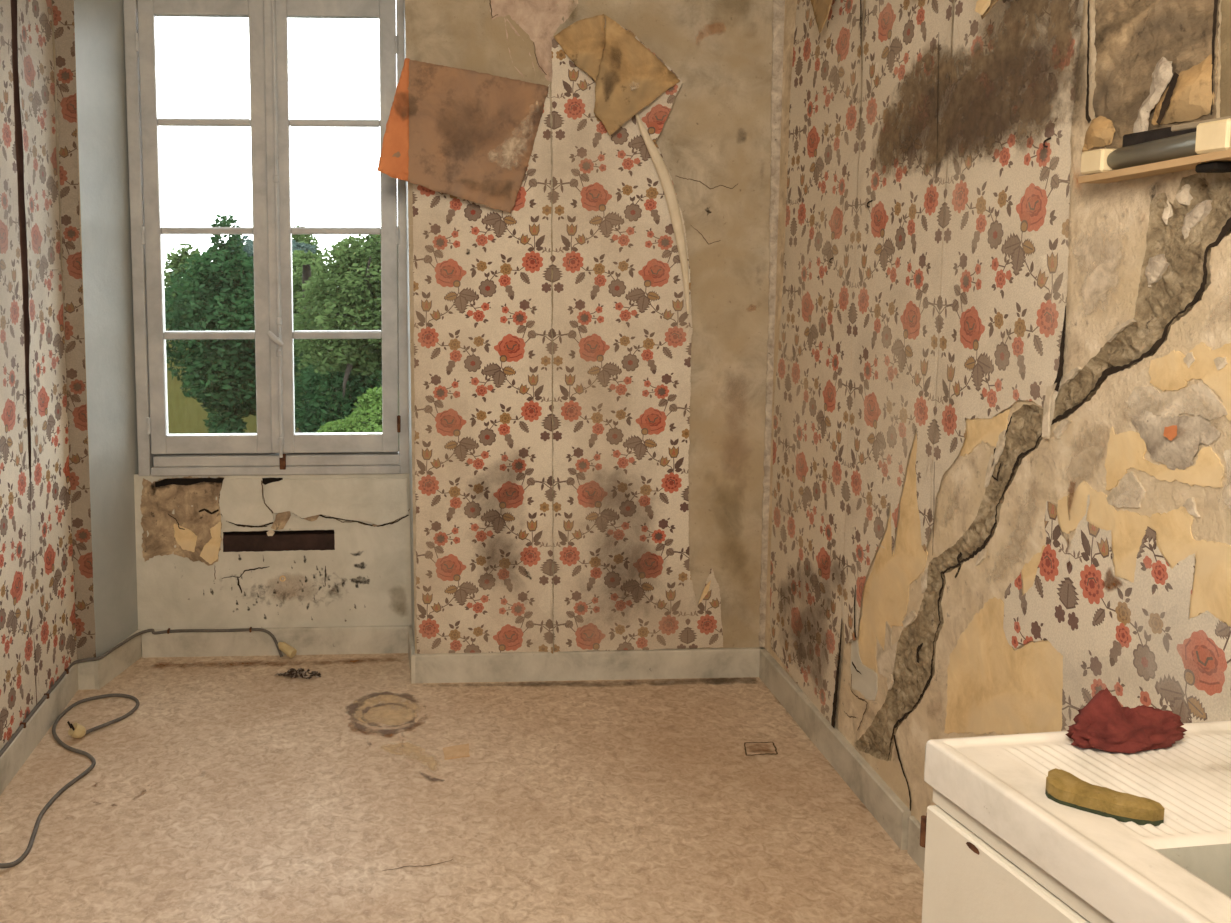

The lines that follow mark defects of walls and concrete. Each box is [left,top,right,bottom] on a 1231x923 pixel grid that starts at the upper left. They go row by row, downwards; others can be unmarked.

flaking render [489,0,578,82]
water stain [875,0,1084,172]
flaking render [1093,0,1220,148]
peeling [1042,383,1057,439]
flaking render [1126,382,1228,420]
flaking render [140,476,408,566]
crack [218,481,410,528]
crack [831,172,1231,815]
crack [214,566,270,593]
flaking render [851,621,898,701]